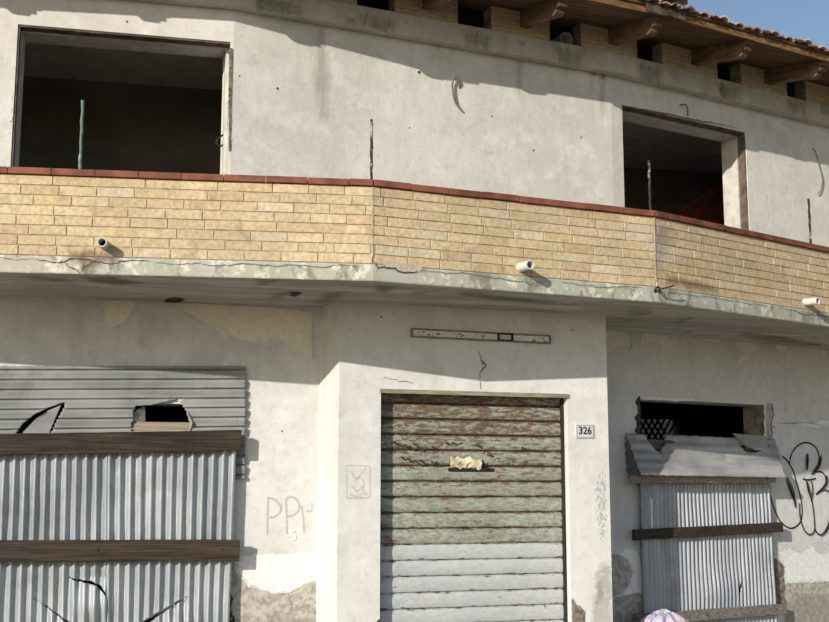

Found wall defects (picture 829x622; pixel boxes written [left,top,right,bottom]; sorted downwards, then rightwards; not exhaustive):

crack [0,257,352,272]
crack [373,259,537,286]
peeling [164,298,315,361]
peeling [634,396,696,434]
flaking render [764,400,775,446]
peeling [229,551,317,622]
peeling [611,548,643,622]
peeling [774,546,829,622]